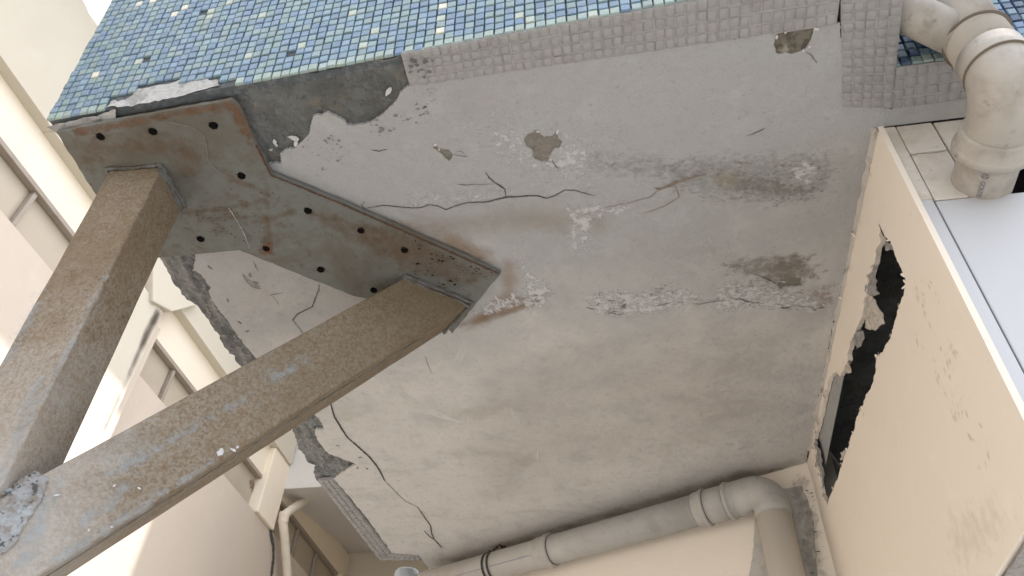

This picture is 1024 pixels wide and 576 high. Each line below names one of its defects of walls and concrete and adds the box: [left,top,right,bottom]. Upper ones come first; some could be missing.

flaking render [774,28,819,53]
spalling [120,55,434,176]
rust [76,103,499,274]
crack [362,173,707,216]
flaking render [524,130,562,169]
damp [484,94,823,207]
spalling [159,254,256,367]
flaking render [777,277,801,288]
flaking render [807,128,893,505]
spalling [293,415,368,480]
crack [329,404,442,548]